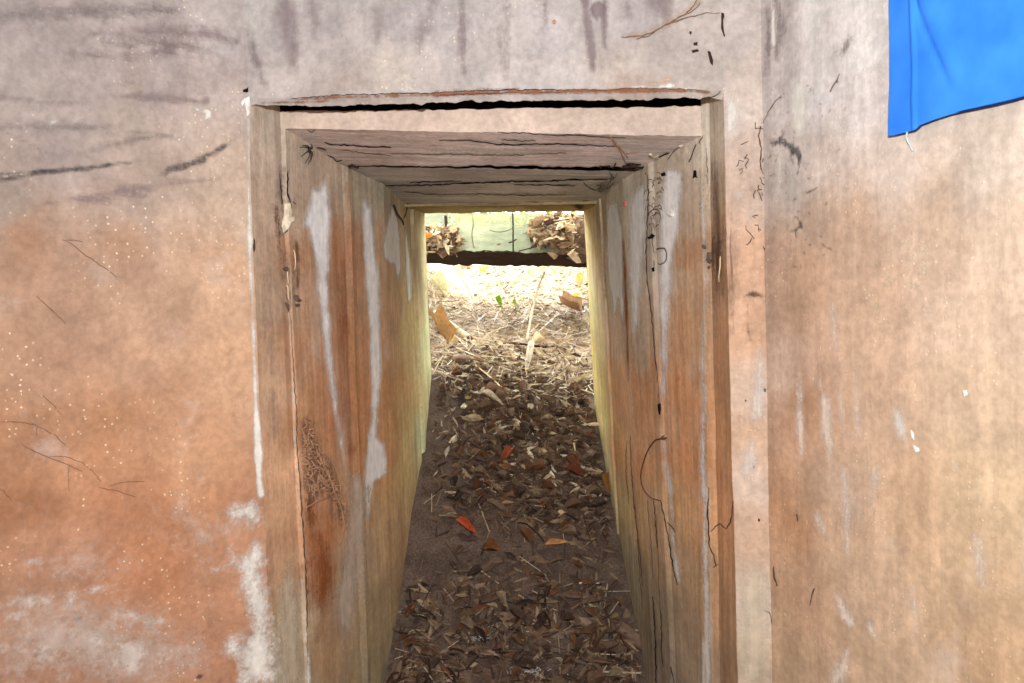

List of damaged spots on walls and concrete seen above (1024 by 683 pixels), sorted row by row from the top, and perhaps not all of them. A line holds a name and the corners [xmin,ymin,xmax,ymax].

crack [307,129,624,254]
leakage [306,183,336,411]
leakage [337,203,411,632]
leakage [231,502,259,525]
leakage [225,544,311,683]